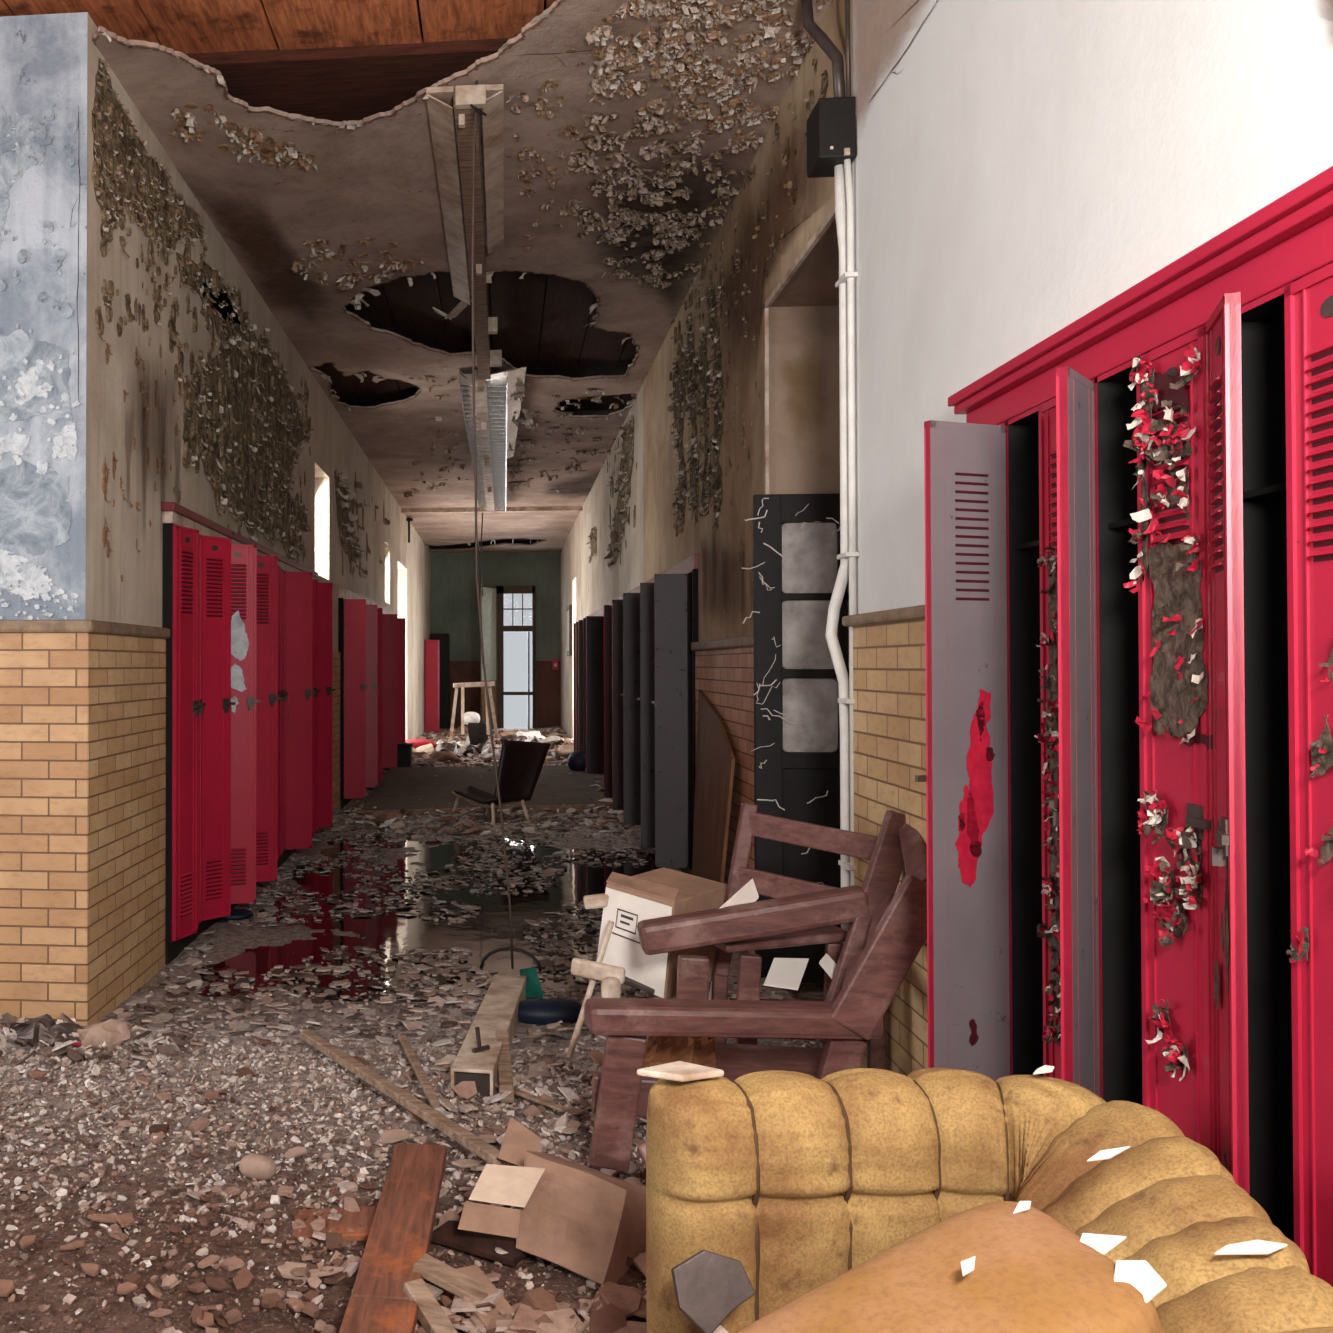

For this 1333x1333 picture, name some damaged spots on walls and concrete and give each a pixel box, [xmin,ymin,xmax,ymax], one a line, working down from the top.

peeling [0,0,566,578]
peeling [505,0,828,537]
peeling [0,324,81,620]
peeling [506,369,637,571]
peeling [1123,347,1217,745]
peeling [1034,543,1061,1044]
peeling [1137,790,1221,947]
peeling [1305,826,1333,867]
peeling [1309,714,1333,778]
peeling [1319,636,1333,682]
peeling [1033,1065,1054,1075]
peeling [1146,999,1190,1082]